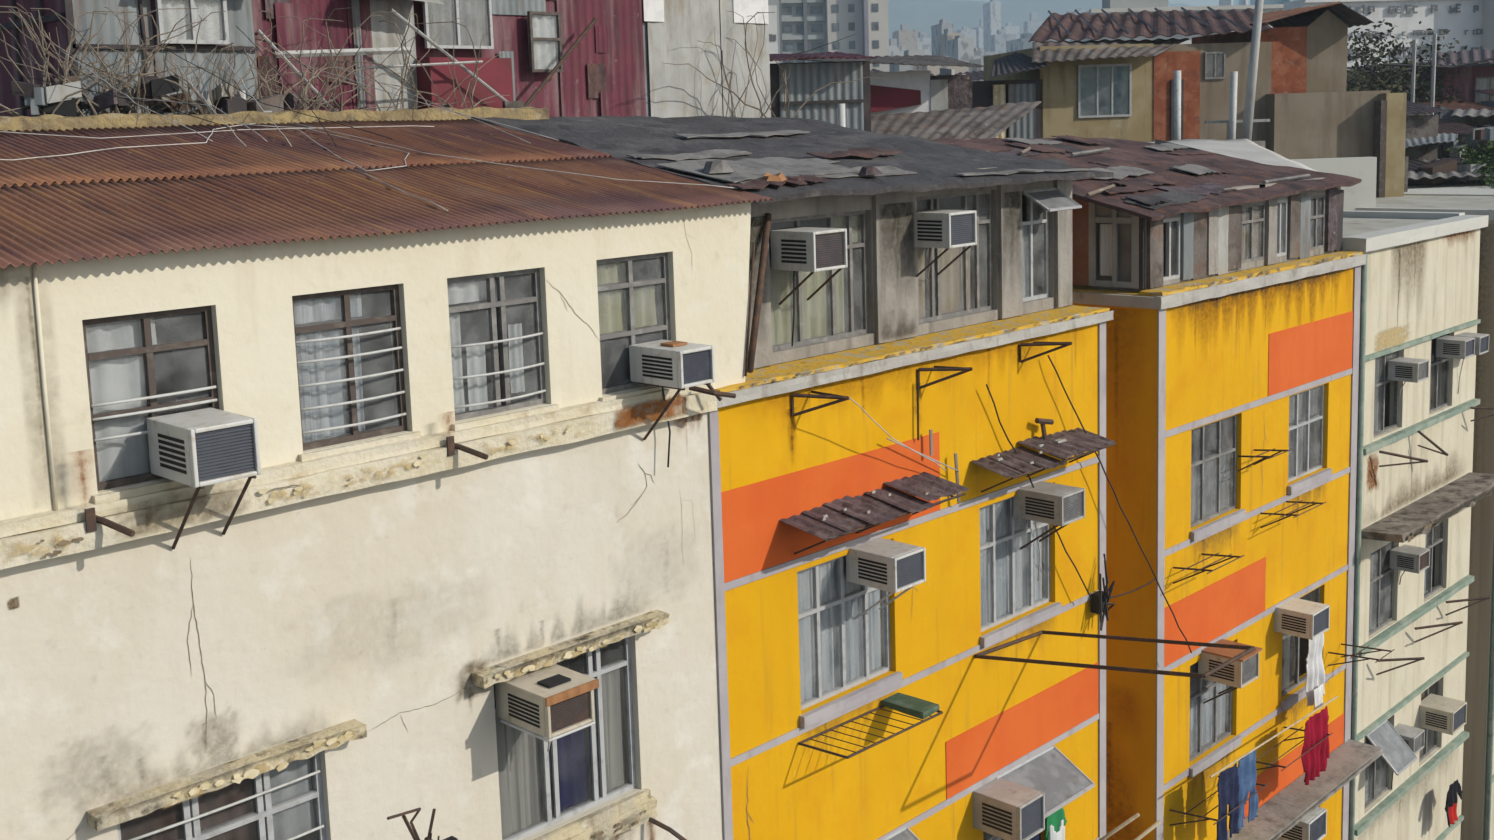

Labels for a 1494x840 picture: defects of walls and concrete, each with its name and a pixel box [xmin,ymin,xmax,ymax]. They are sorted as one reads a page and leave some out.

damp [749,216,766,275]
damp [1375,326,1408,351]
corrosion [616,396,701,428]
corrosion [77,450,87,496]
crack [621,466,695,565]
crack [187,560,217,732]
damp [505,618,652,670]
peeling [495,622,662,679]
peeling [168,731,353,806]